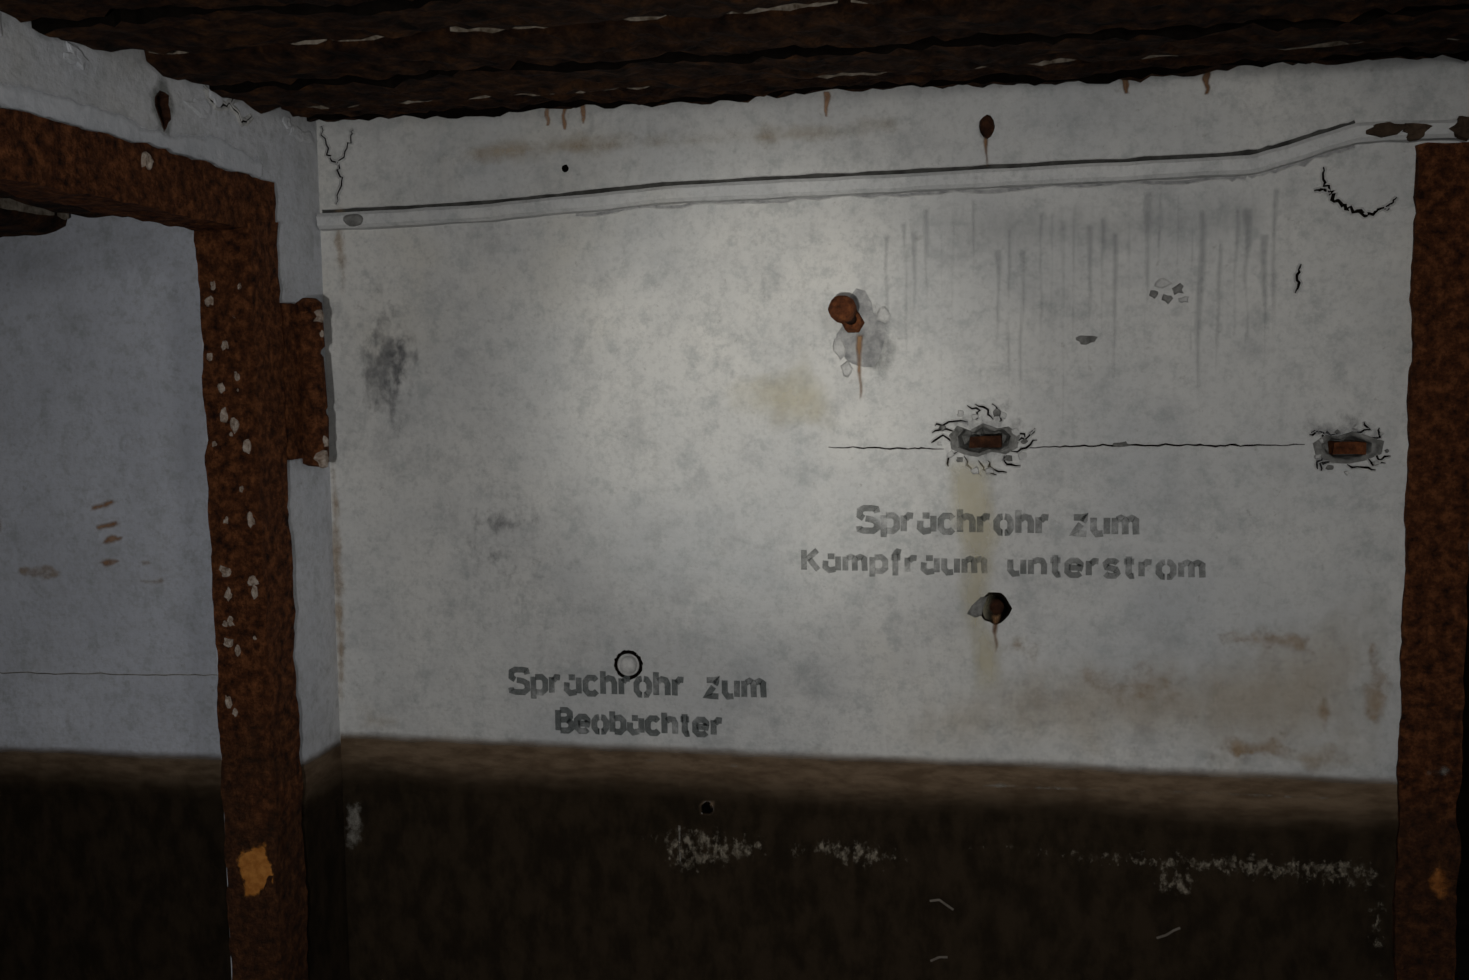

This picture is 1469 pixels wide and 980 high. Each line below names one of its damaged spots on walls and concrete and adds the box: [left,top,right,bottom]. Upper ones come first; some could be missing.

rust [1202,72,1210,94]
crack [319,119,1399,219]
hole [930,402,1037,477]
hole [1309,421,1391,476]
rust [92,501,121,566]
spalling [967,592,1012,624]
rust [237,844,273,896]